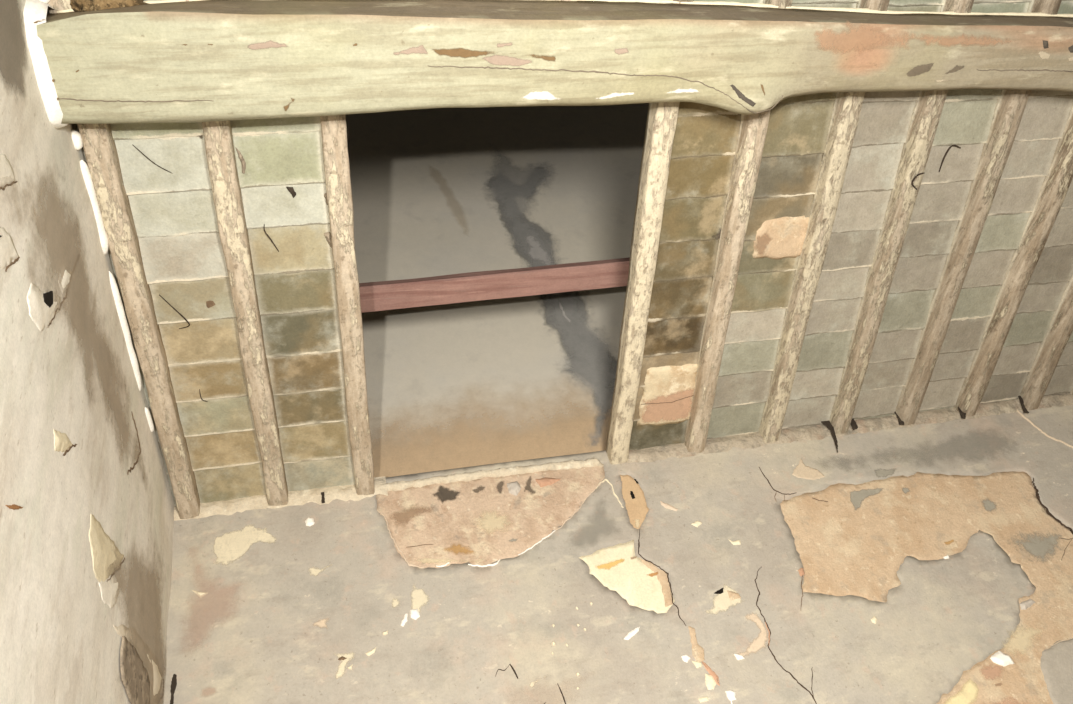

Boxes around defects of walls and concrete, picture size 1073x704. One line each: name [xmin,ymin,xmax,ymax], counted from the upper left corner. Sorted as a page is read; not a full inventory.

peeling [0,153,18,191]
peeling [0,227,20,272]
spalling [753,216,809,259]
peeling [27,270,71,331]
spalling [637,364,698,426]
spalling [376,457,678,614]
crack [1032,478,1073,561]
spalling [780,459,1073,704]
crack [755,568,817,704]